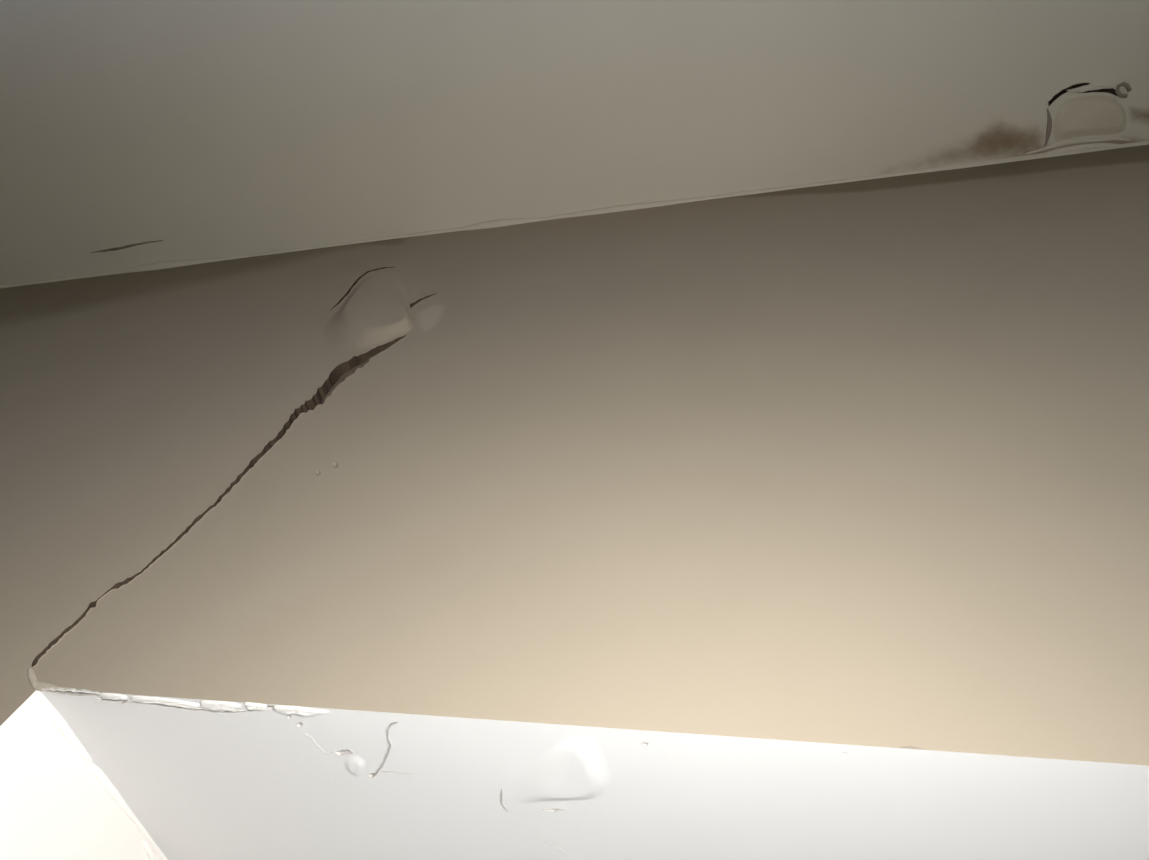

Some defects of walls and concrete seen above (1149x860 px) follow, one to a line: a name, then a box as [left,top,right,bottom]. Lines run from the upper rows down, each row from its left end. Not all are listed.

water stain [671,93,1149,205]
crack [31,335,407,667]